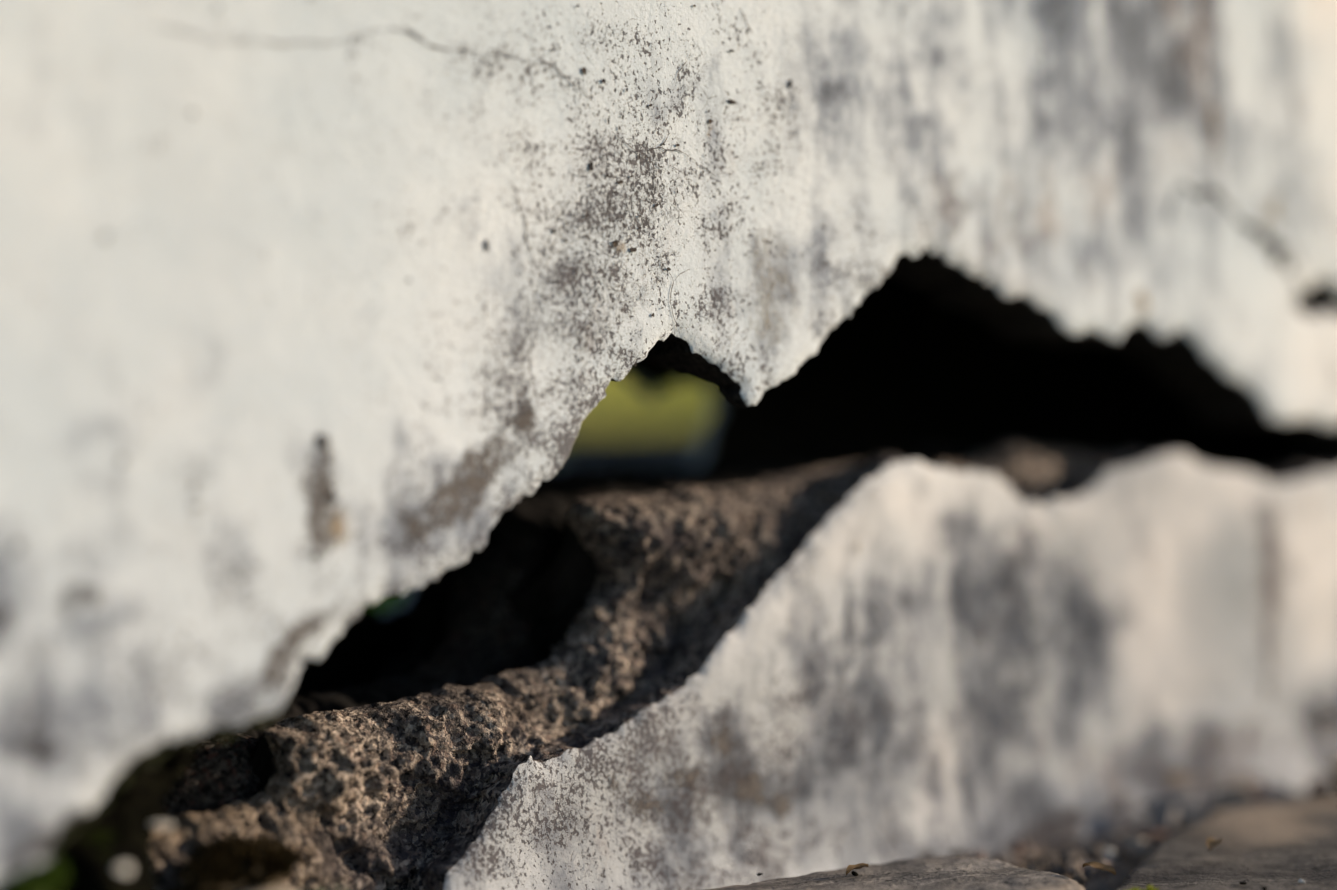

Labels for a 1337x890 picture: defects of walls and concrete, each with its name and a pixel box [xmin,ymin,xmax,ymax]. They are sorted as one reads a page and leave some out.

crack [154,25,592,101]
crack [613,131,715,176]
damp [552,143,692,344]
crack [1168,183,1306,313]
damp [301,434,338,560]
damp [398,399,535,542]
spalling [903,440,1111,498]
spalling [150,461,867,890]
damp [628,712,792,823]